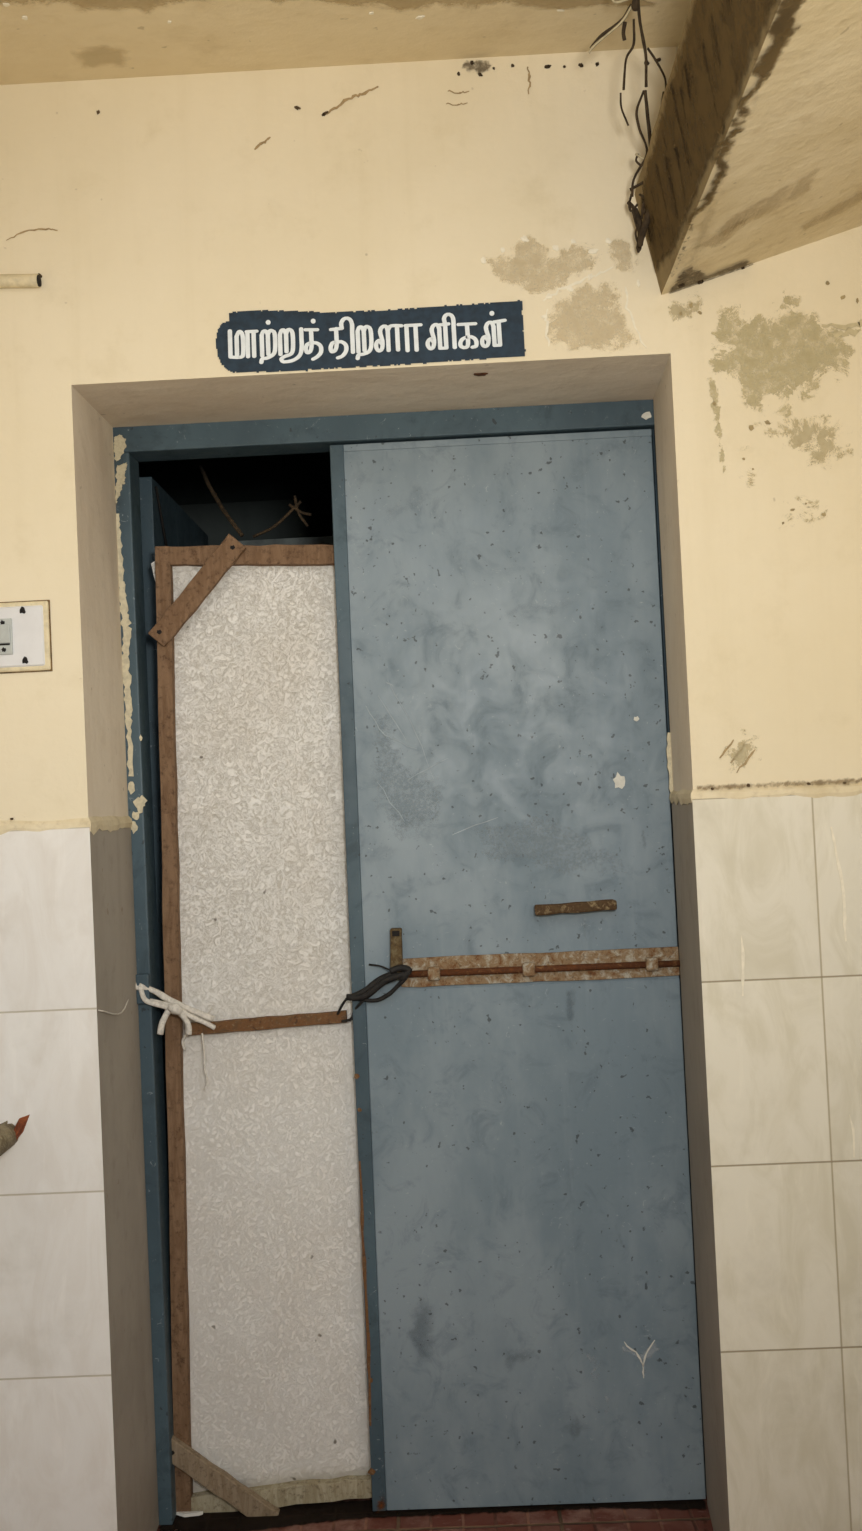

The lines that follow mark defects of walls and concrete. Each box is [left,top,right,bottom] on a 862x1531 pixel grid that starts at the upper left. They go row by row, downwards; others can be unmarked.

peeling [481,235,647,350]
peeling [668,301,702,320]
peeling [709,281,862,473]
rust [14,1115,29,1140]